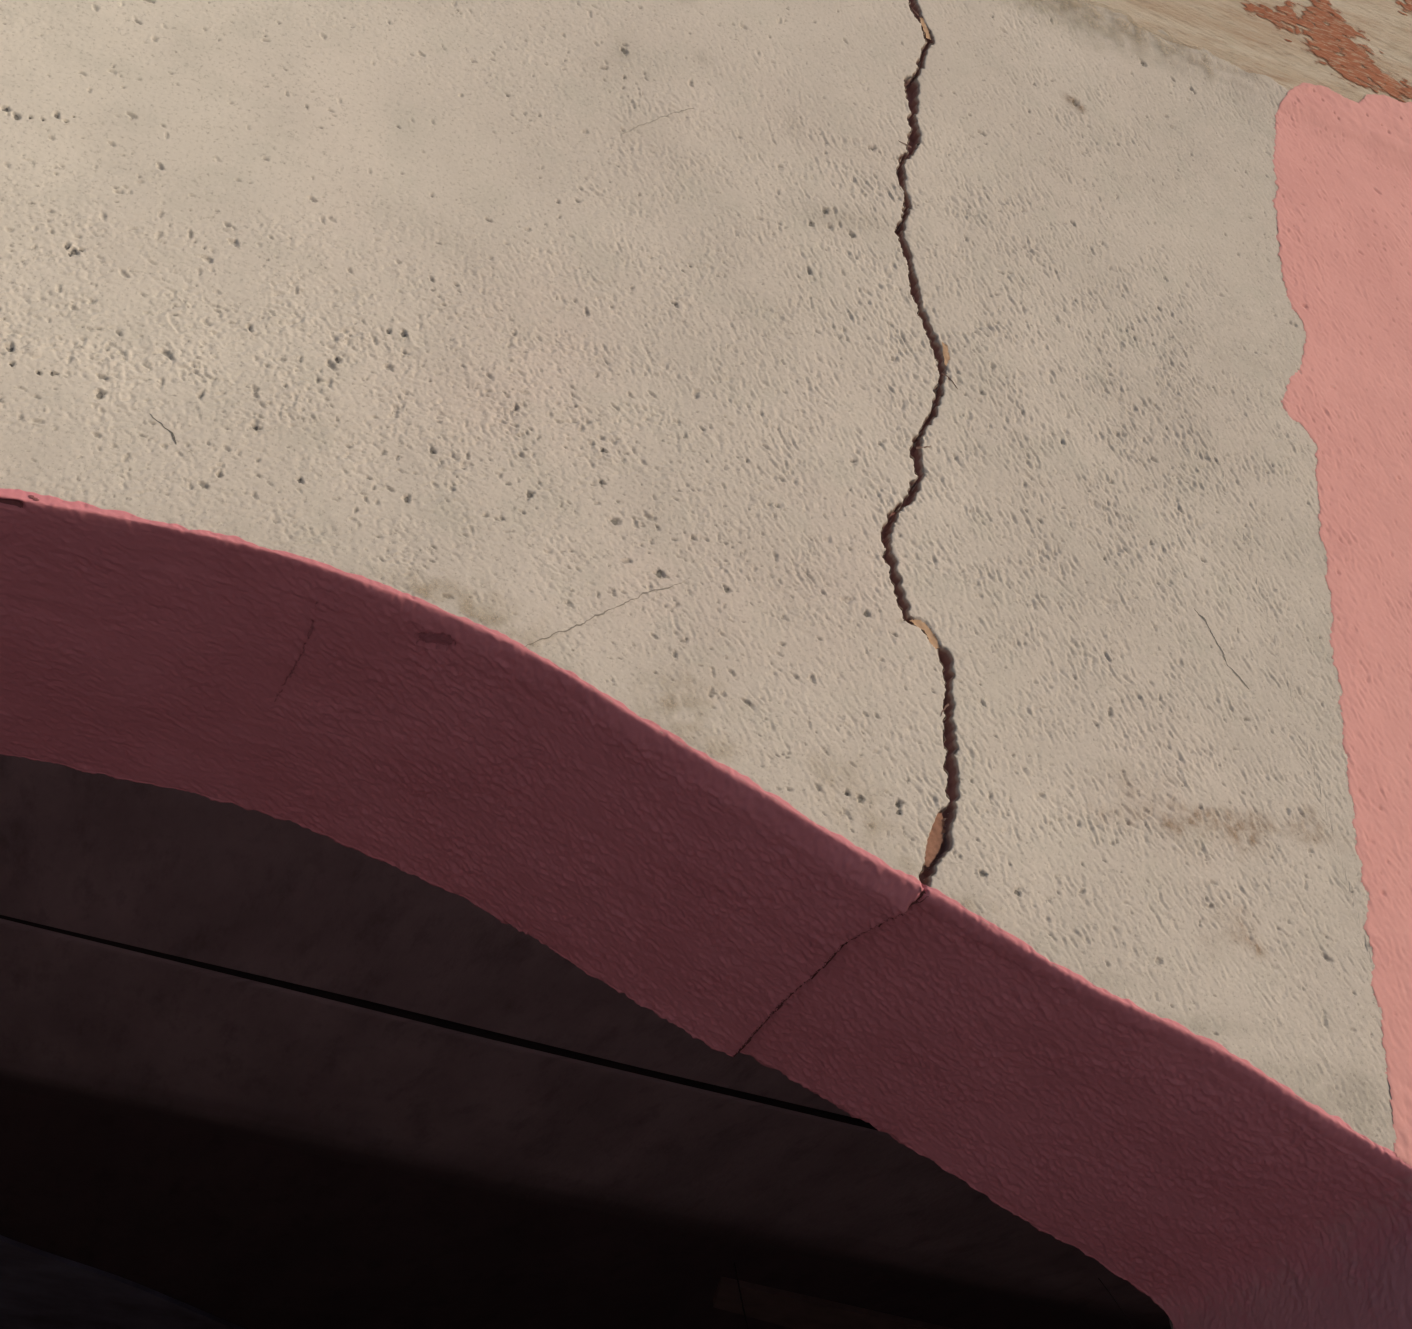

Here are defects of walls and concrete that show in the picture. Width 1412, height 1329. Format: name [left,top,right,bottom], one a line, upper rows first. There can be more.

crack [733,0,960,1057]
peeling [1241,0,1412,103]